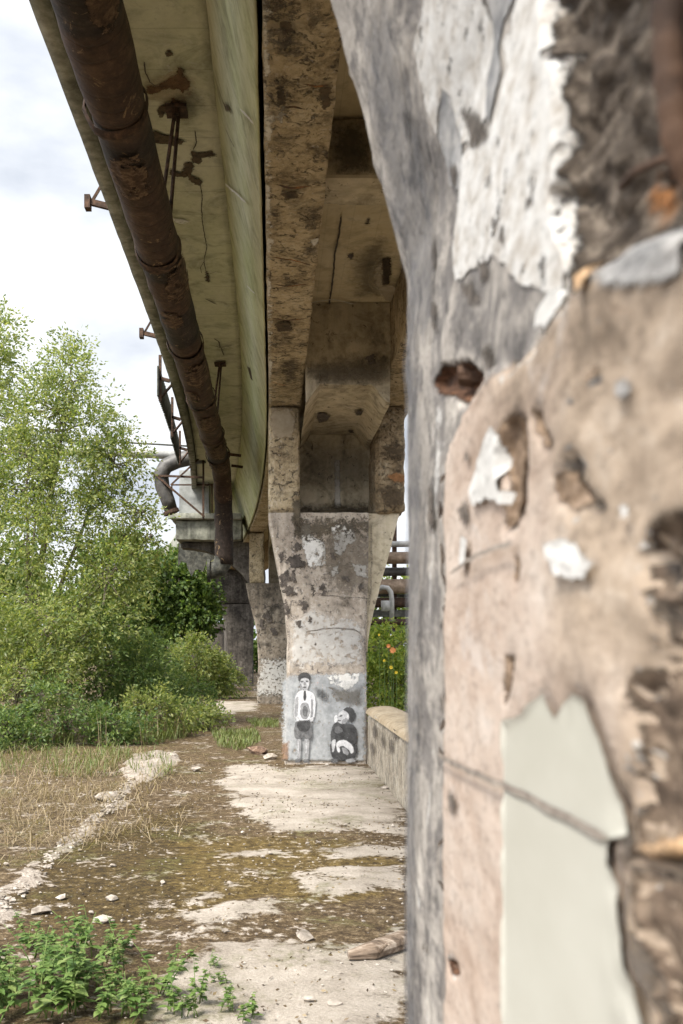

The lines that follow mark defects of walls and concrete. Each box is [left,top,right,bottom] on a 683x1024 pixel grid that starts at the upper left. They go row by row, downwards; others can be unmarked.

spalling [414,0,683,329]
peeling [256,524,368,701]
spalling [457,407,553,565]
spalling [544,537,592,580]